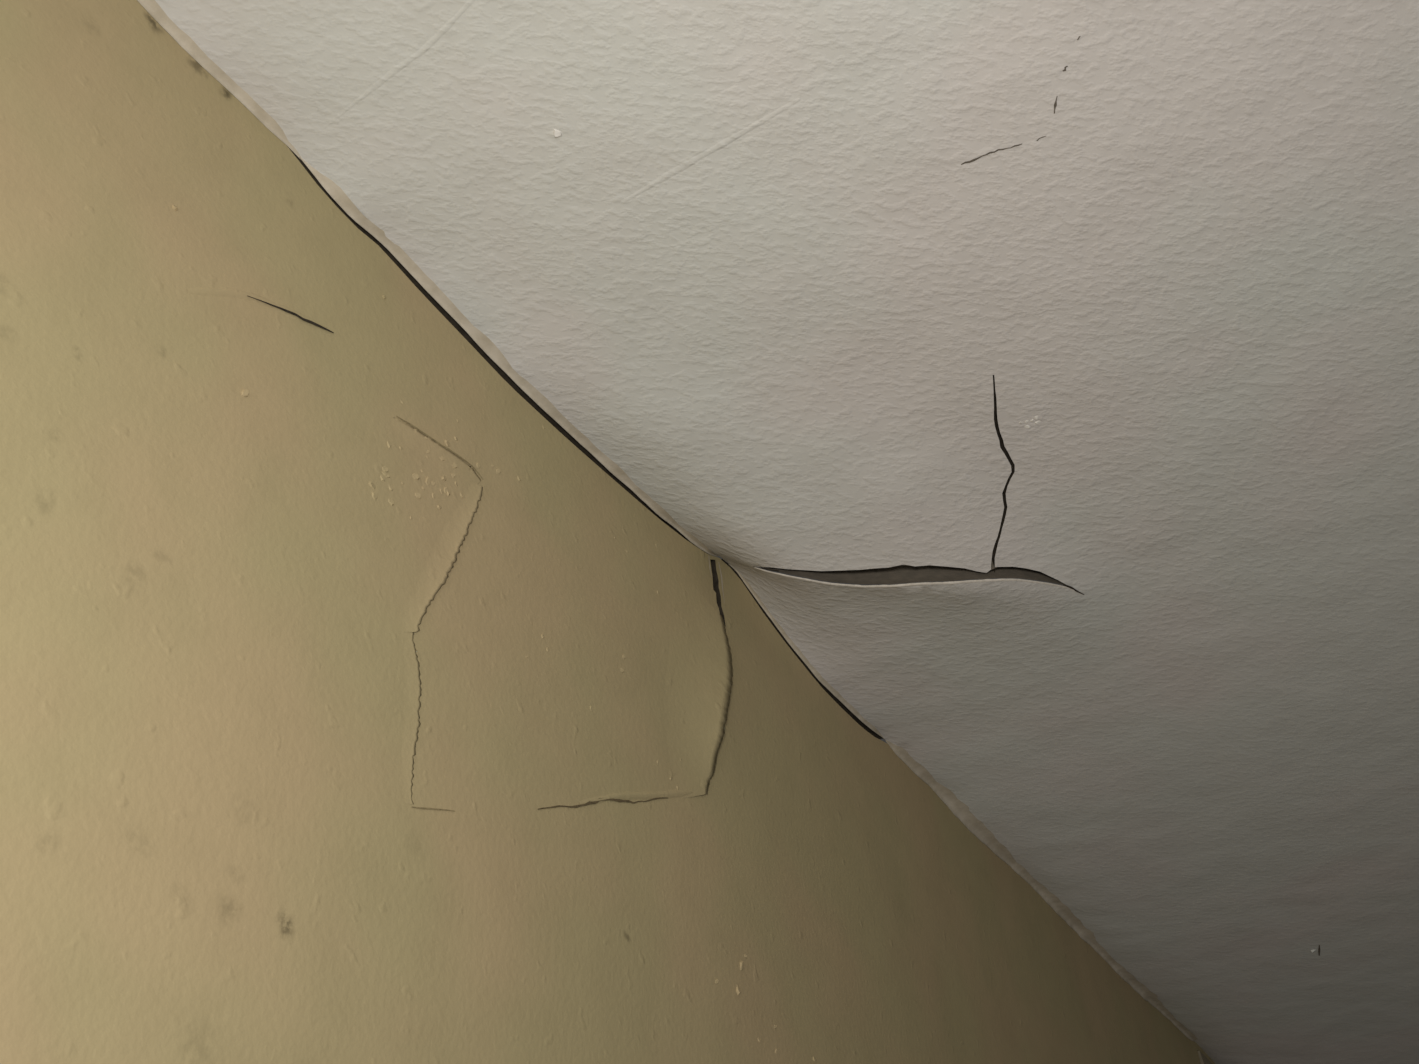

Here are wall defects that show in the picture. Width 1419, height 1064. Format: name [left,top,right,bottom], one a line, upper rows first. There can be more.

crack [186,286,334,335]
crack [287,146,885,742]
crack [992,375,1015,572]
peeling [392,416,483,811]
peeling [664,582,733,799]